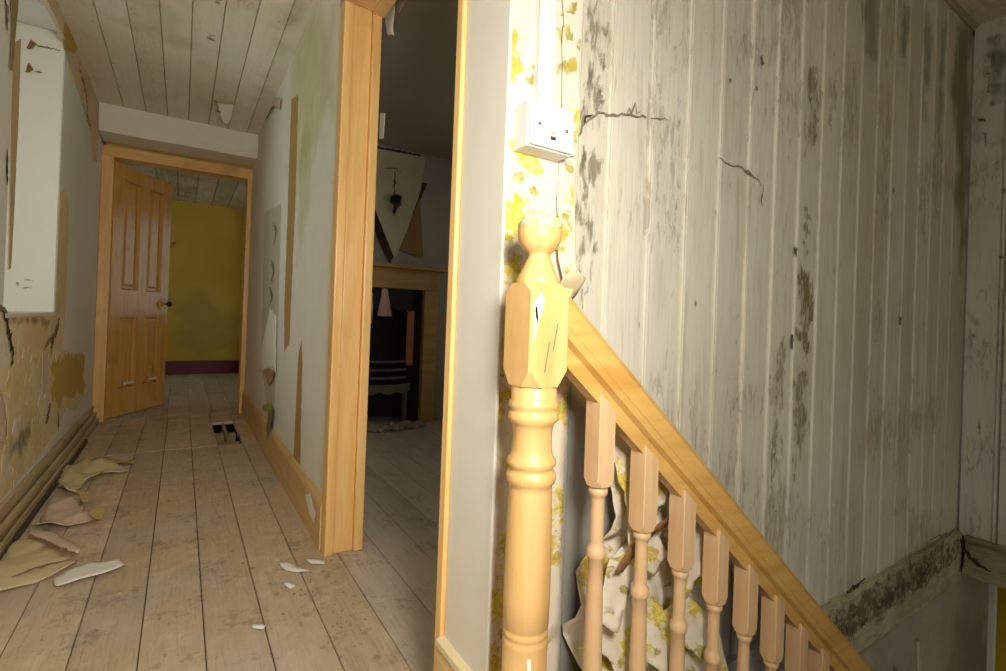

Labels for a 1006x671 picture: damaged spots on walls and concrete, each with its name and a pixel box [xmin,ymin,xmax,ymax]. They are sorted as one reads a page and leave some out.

crack [578,102,668,136]
crack [721,158,764,206]
peeling [0,188,86,501]
leakage [830,538,964,640]